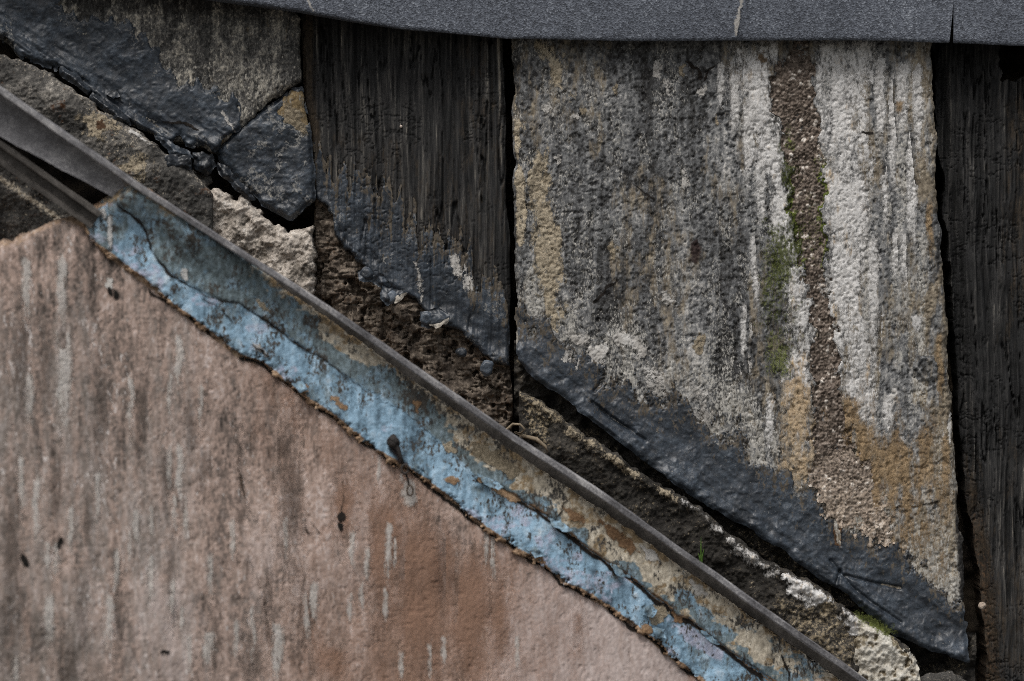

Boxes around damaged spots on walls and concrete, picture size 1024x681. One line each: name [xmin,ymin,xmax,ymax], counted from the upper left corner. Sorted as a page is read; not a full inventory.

peeling [513,104,670,398]
leakage [689,238,701,264]
leakage [717,40,924,460]
flaking render [769,40,897,548]
flaking render [337,481,346,531]
crack [116,204,699,681]
peeling [550,506,585,532]
peeling [521,396,642,479]
peeling [598,519,659,561]
crack [517,501,790,681]
peeling [654,484,692,508]
peeling [706,516,859,635]